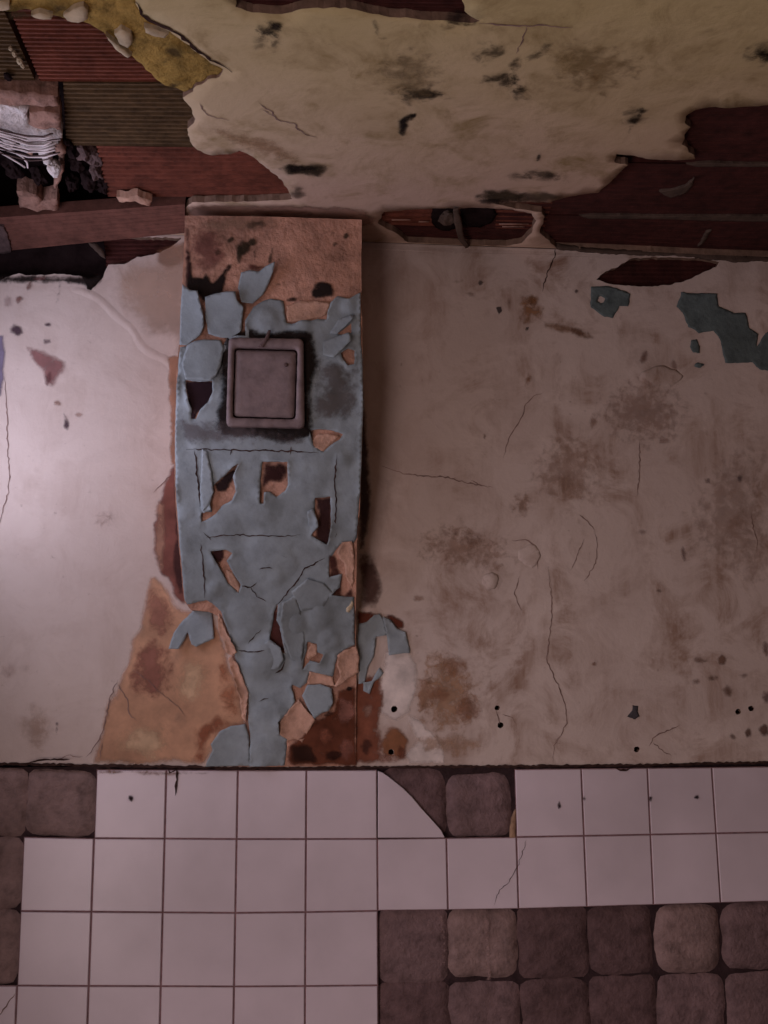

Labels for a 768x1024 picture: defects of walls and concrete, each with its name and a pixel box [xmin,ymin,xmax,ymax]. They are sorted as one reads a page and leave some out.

crack [261,106,314,137]
leakage [399,114,416,135]
mould [405,90,442,99]
mould [476,190,557,204]
peeling [676,292,768,371]
peeling [169,262,410,767]
corrosion [358,411,380,624]
crack [383,466,491,487]
crack [0,515,768,795]
corrosion [387,616,403,628]
corrosion [289,677,408,766]
peeling [378,901,768,1024]